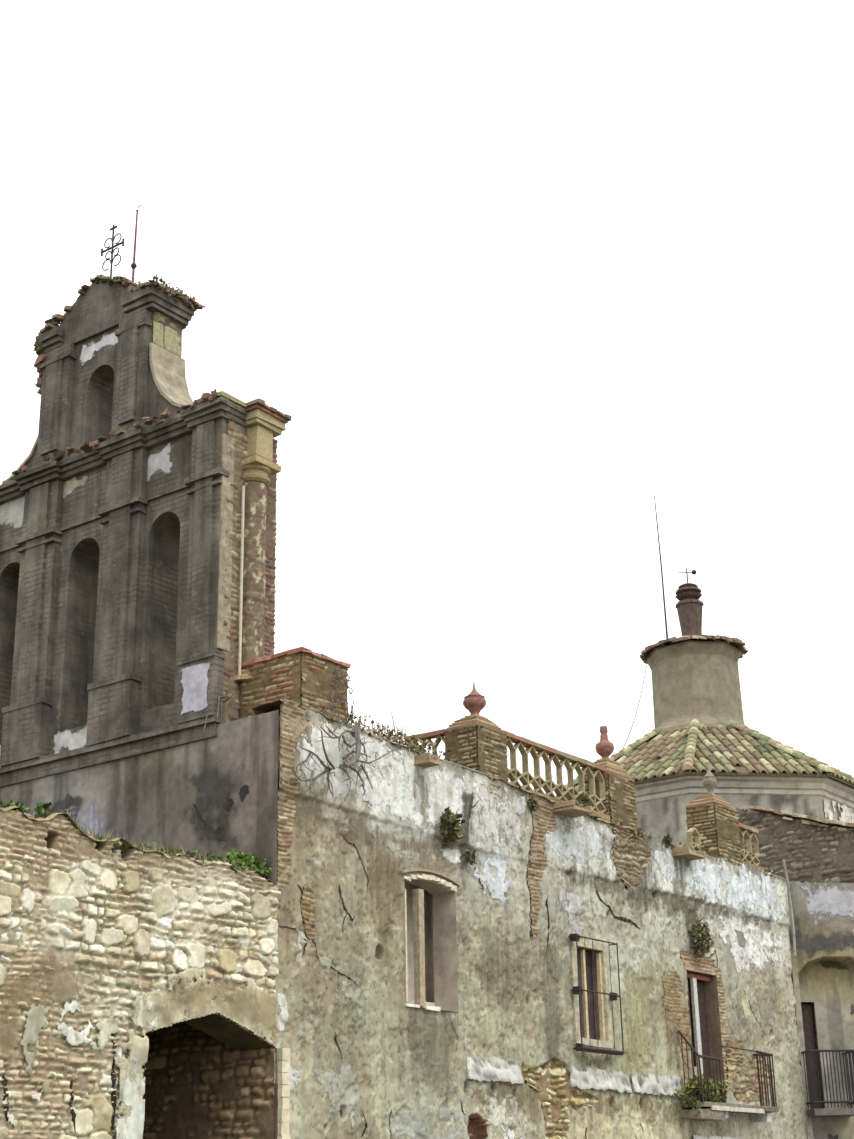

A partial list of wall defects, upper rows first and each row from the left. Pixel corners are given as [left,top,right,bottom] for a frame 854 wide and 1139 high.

crack [339,834,369,934]
peeling [277,700,787,975]
crack [279,884,359,988]
spalling [295,886,364,1008]
peeling [276,992,289,1031]
spalling [662,950,776,1103]
peeling [115,1048,145,1139]
peeling [467,1093,527,1139]
spalling [521,1060,598,1139]